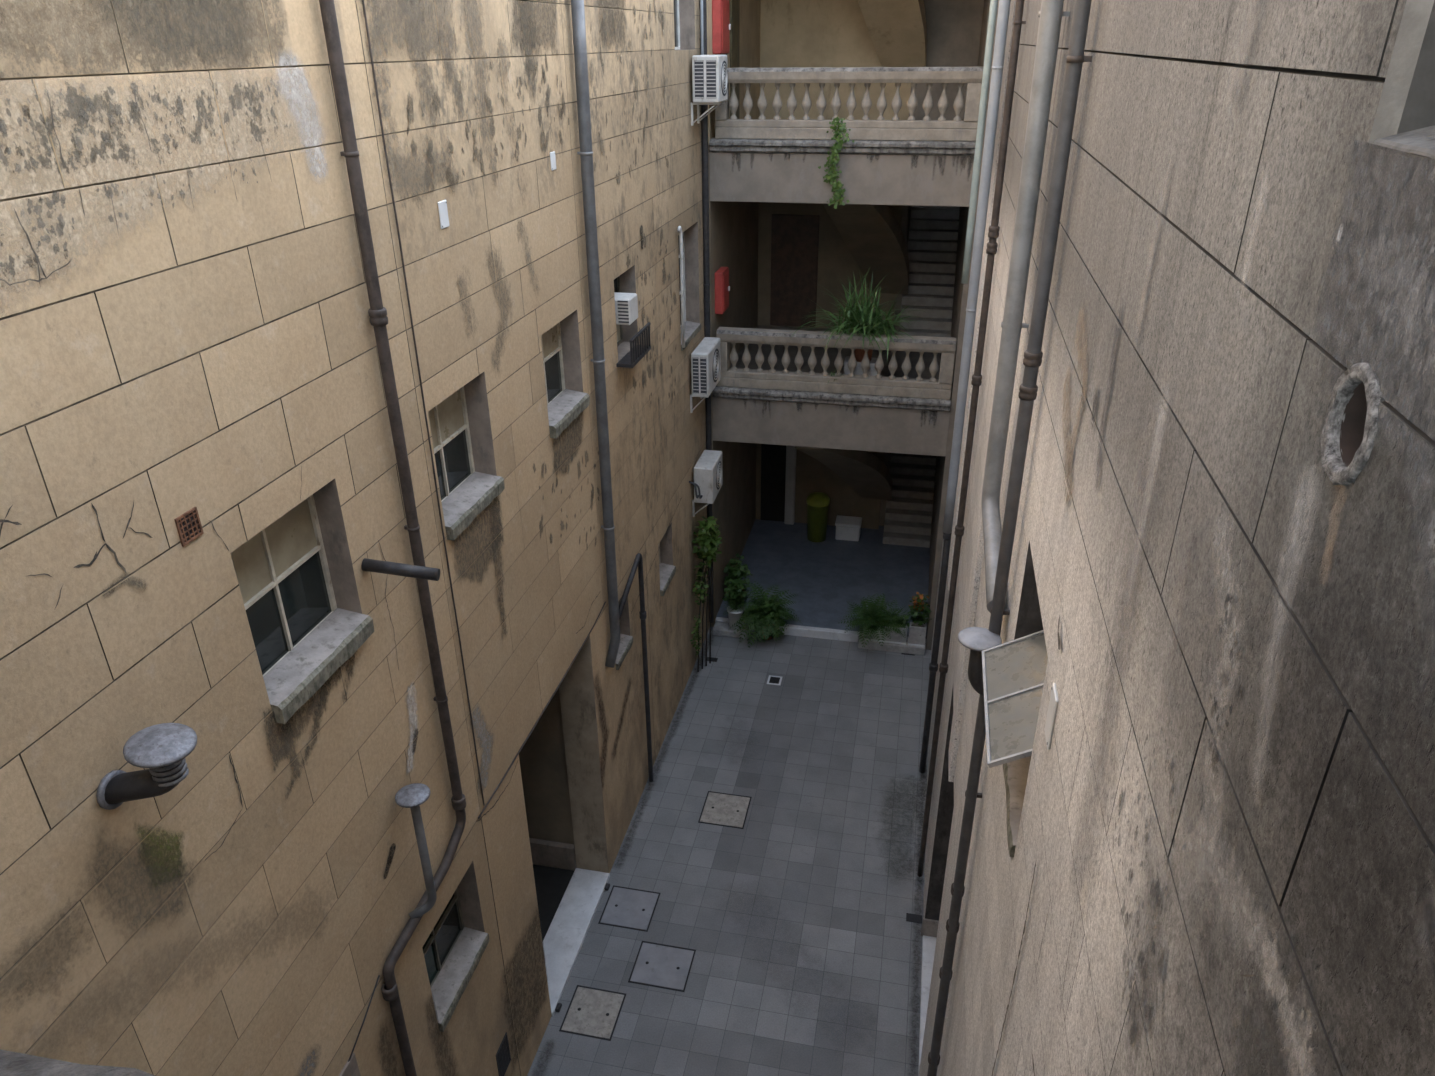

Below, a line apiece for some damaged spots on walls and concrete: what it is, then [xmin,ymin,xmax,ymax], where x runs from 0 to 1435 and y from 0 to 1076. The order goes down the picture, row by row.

leakage [368,0,570,204]
crack [0,209,72,287]
crack [0,506,22,535]
crack [28,501,153,610]
leakage [454,496,506,635]
leakage [263,651,357,795]